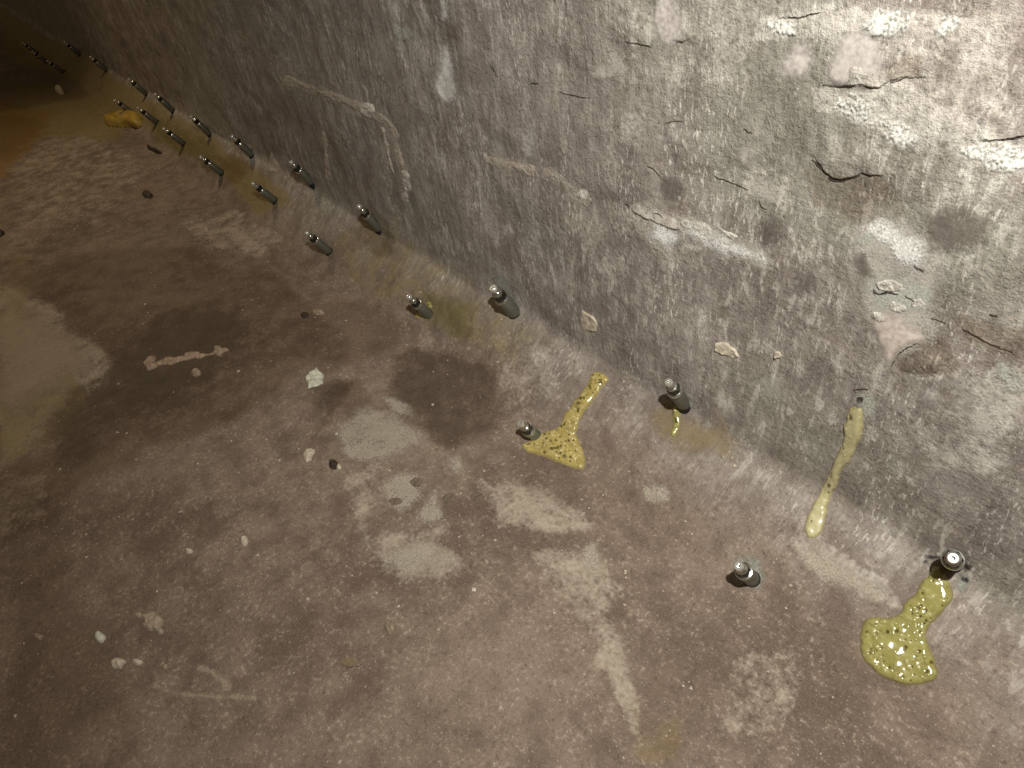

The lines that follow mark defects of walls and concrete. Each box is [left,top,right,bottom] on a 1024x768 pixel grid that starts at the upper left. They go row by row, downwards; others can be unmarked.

leakage [767,20,795,35]
leakage [863,10,910,37]
leakage [938,15,961,35]
leakage [834,93,920,147]
leakage [960,139,1024,171]
crack [873,289,1012,352]
leakage [339,354,492,462]